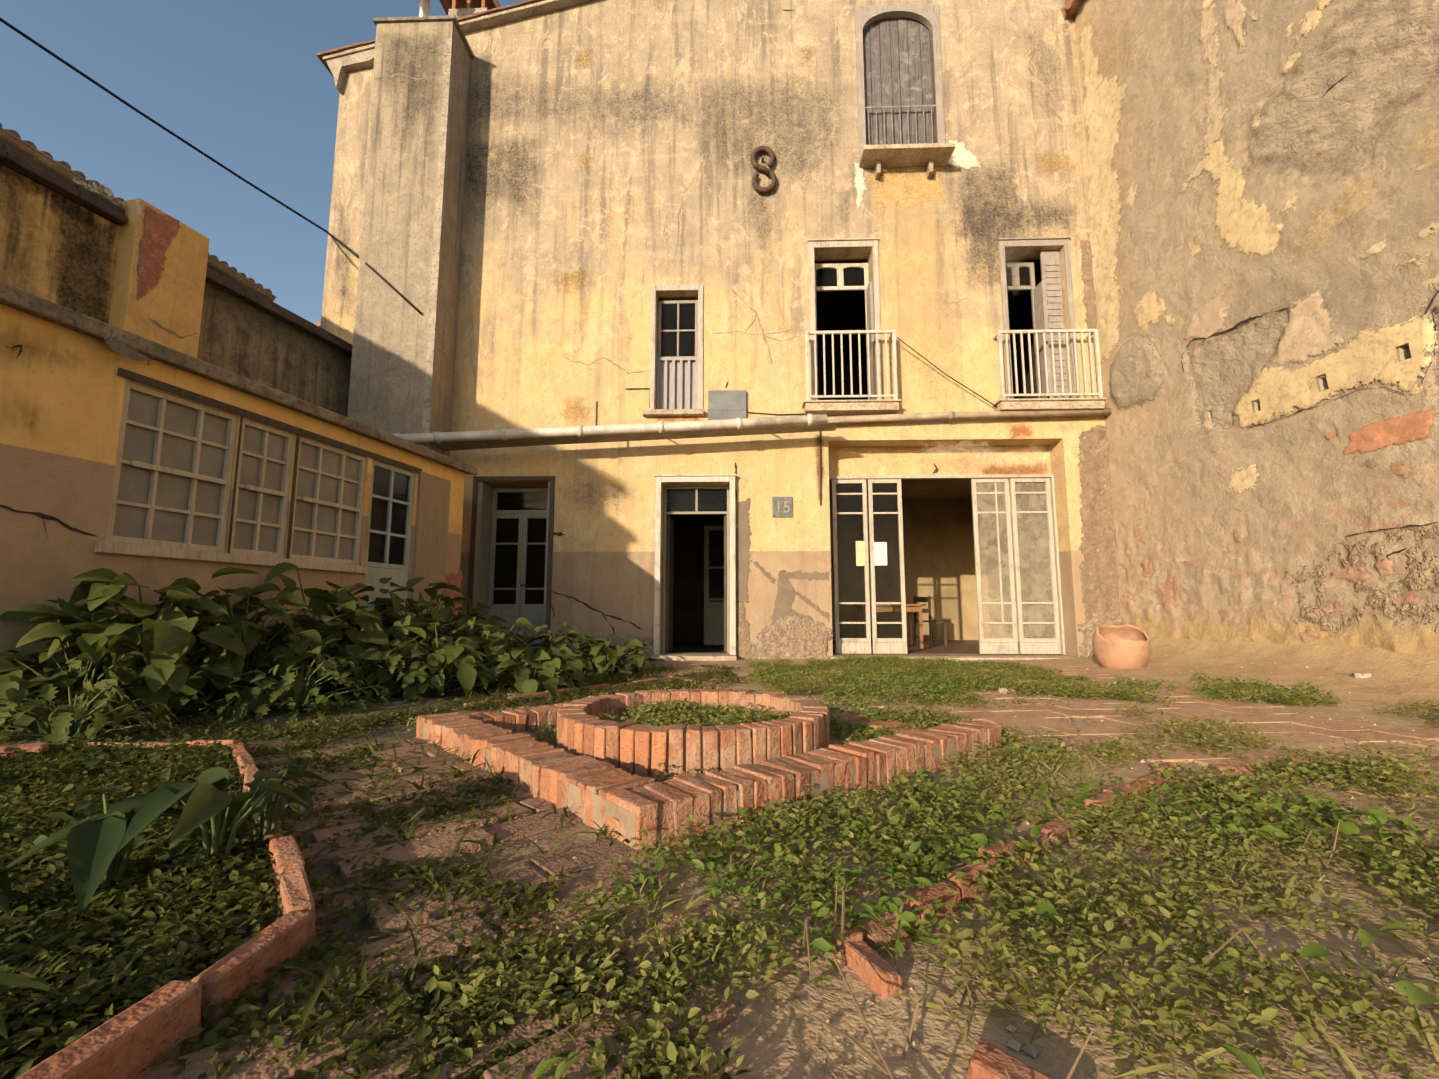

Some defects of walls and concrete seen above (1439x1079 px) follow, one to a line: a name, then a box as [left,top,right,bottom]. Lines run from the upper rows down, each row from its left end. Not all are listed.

damp [467,143,533,208]
damp [703,90,828,170]
peeling [854,162,944,209]
peeling [949,140,981,169]
damp [0,162,114,324]
peeling [131,200,181,300]
peeling [1077,0,1439,479]
peeling [1227,462,1261,494]
crack [0,505,129,544]
spalling [1284,523,1439,643]